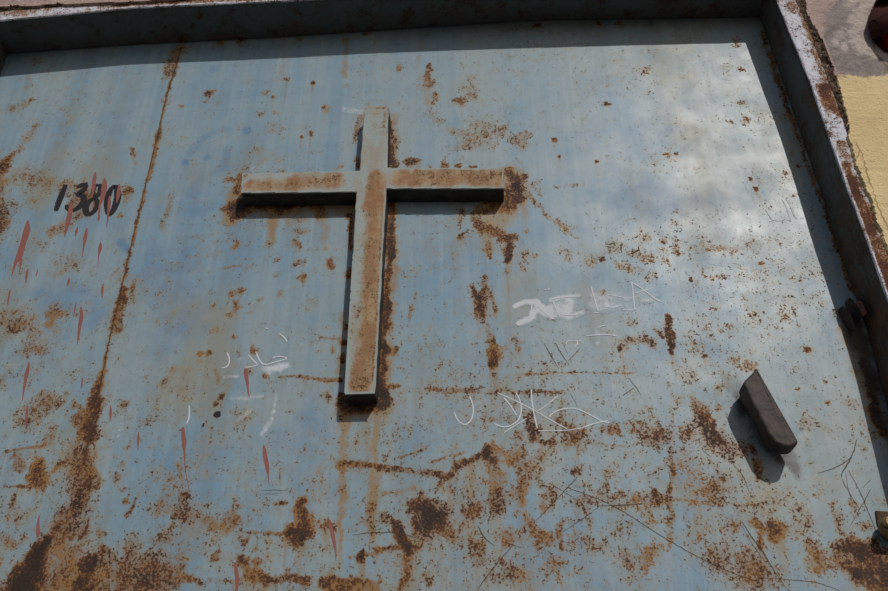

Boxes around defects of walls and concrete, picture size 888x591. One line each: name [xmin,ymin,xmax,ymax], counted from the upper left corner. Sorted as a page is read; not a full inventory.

rust [0,0,281,20]
rust [0,41,391,591]
rust [207,0,888,591]